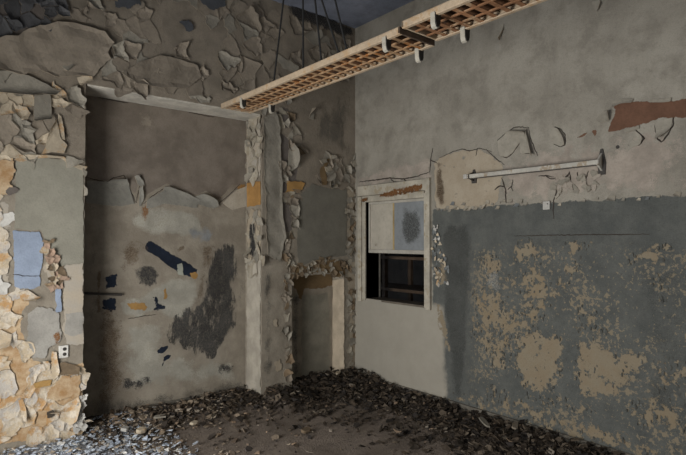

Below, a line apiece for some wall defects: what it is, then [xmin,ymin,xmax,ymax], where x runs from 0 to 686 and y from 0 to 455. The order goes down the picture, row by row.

flaking render [0,0,351,447]
rust [379,184,422,197]
crack [360,126,538,203]
water stain [442,224,473,397]
flaking render [273,98,686,382]
peeling [449,237,686,455]